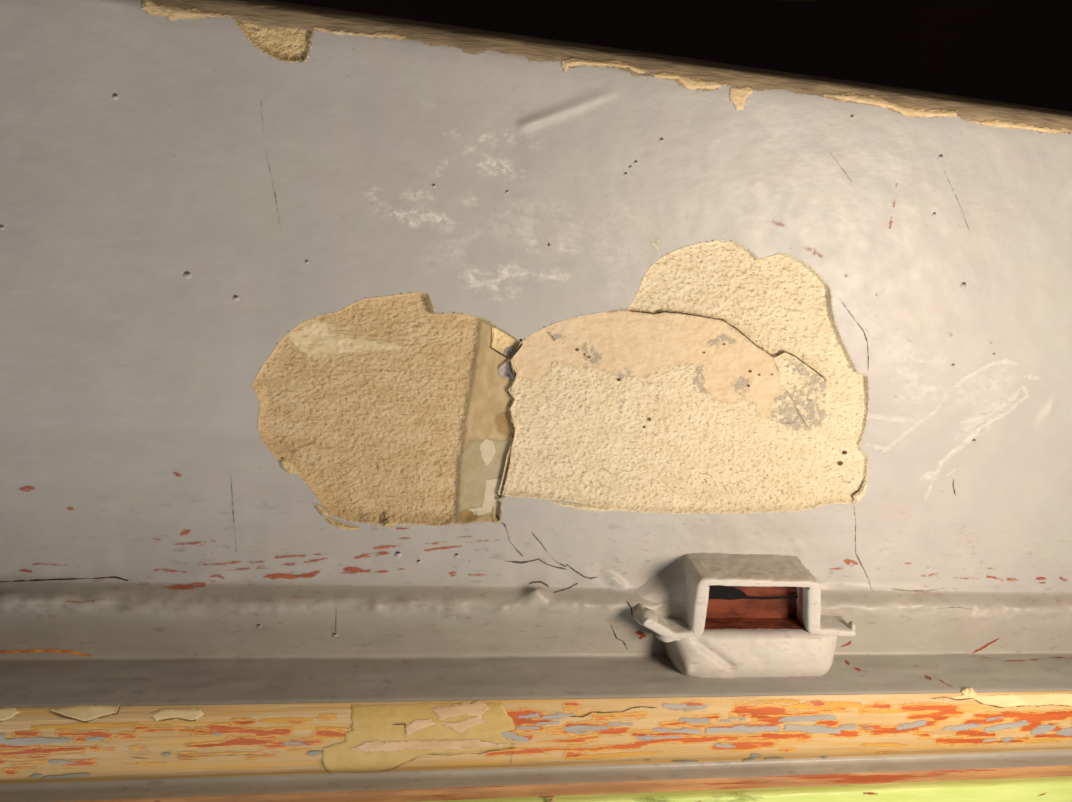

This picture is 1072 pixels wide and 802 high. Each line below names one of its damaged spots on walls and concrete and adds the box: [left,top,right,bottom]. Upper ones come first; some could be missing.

peeling [141,0,1072,134]
peeling [252,238,870,530]
crack [501,522,597,593]
peeling [0,693,1072,780]